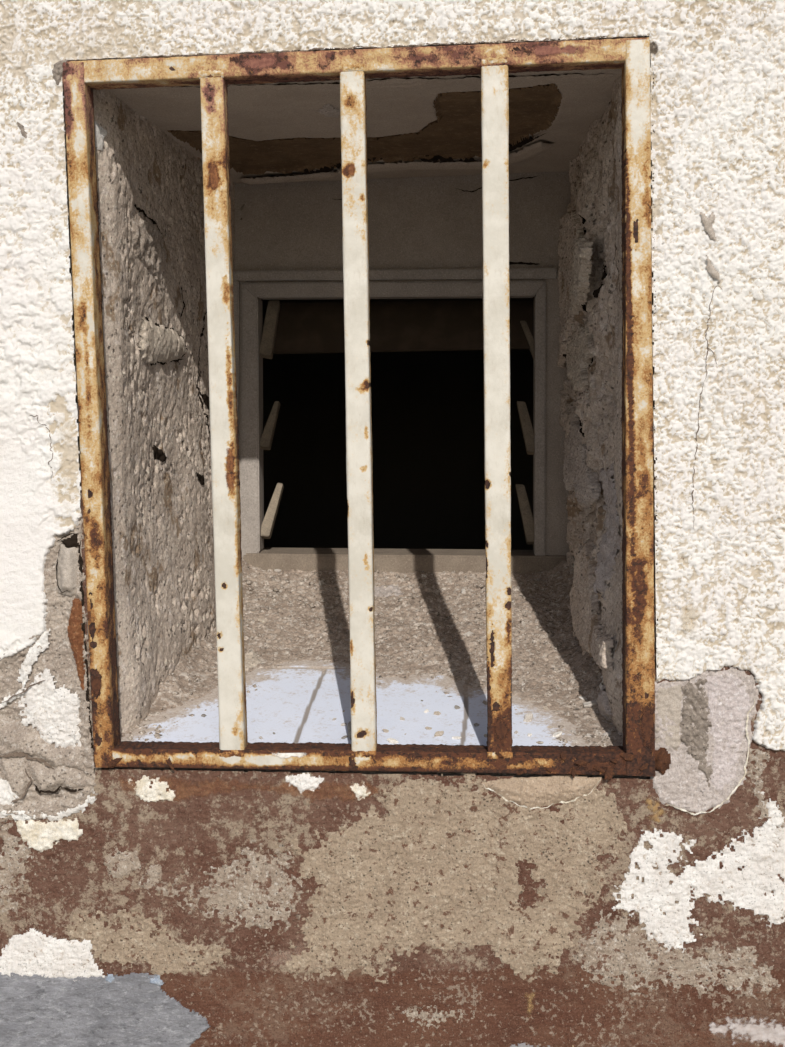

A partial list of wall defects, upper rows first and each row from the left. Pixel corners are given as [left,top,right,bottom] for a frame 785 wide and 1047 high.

rust [530,45,585,56]
rust [208,164,219,189]
rust [226,448,234,490]
rust [67,598,101,695]
flaking render [0,518,101,914]
rust [641,704,671,775]
rust [121,776,378,801]
peeling [103,667,785,999]
peeling [0,907,235,1047]